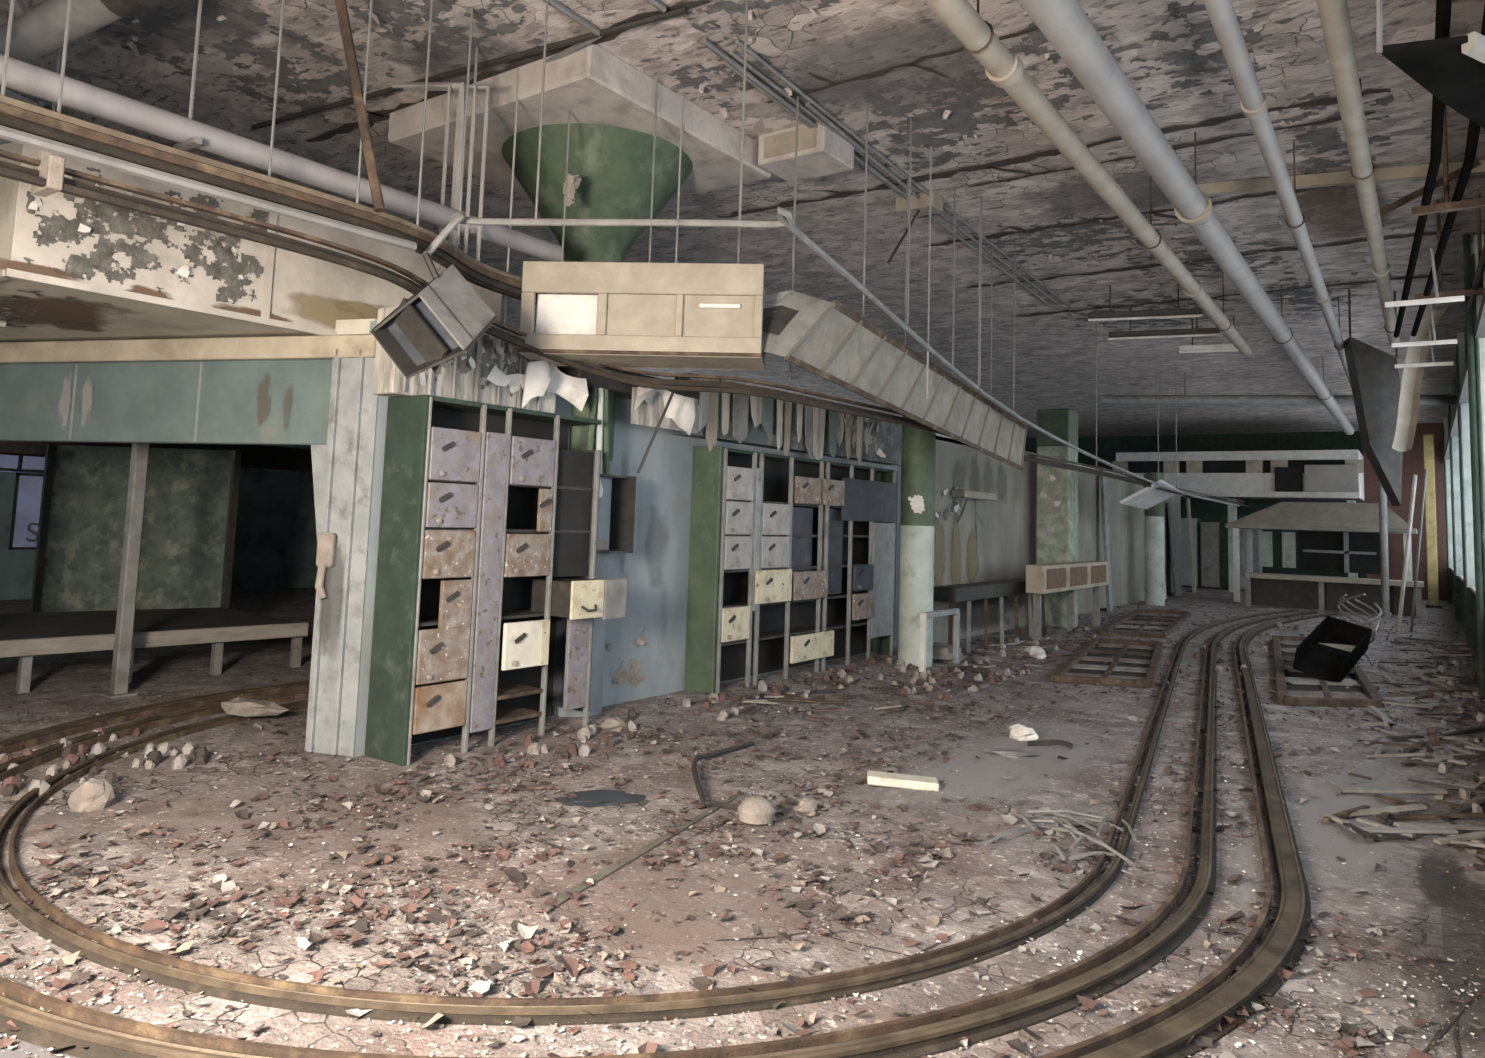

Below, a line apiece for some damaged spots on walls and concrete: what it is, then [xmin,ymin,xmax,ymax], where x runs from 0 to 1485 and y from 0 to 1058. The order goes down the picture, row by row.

peeling [668,0,840,117]
crack [717,136,1136,218]
peeling [831,56,1035,175]
peeling [1010,22,1096,121]
peeling [1096,2,1235,110]
peeling [1237,11,1291,73]
crack [1160,89,1391,150]
peeling [1271,92,1350,174]
peeling [1368,95,1395,161]
peeling [24,167,268,304]
peeling [966,207,1235,336]
peeling [1232,236,1364,320]